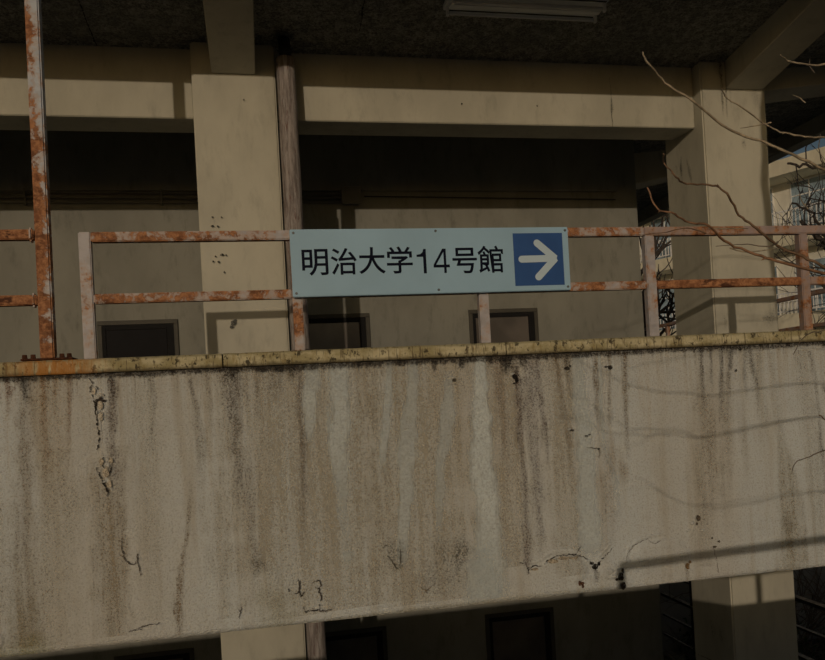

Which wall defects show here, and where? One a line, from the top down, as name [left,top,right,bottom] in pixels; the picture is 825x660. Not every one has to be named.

water stain [0,341,825,632]
crack [520,533,666,575]